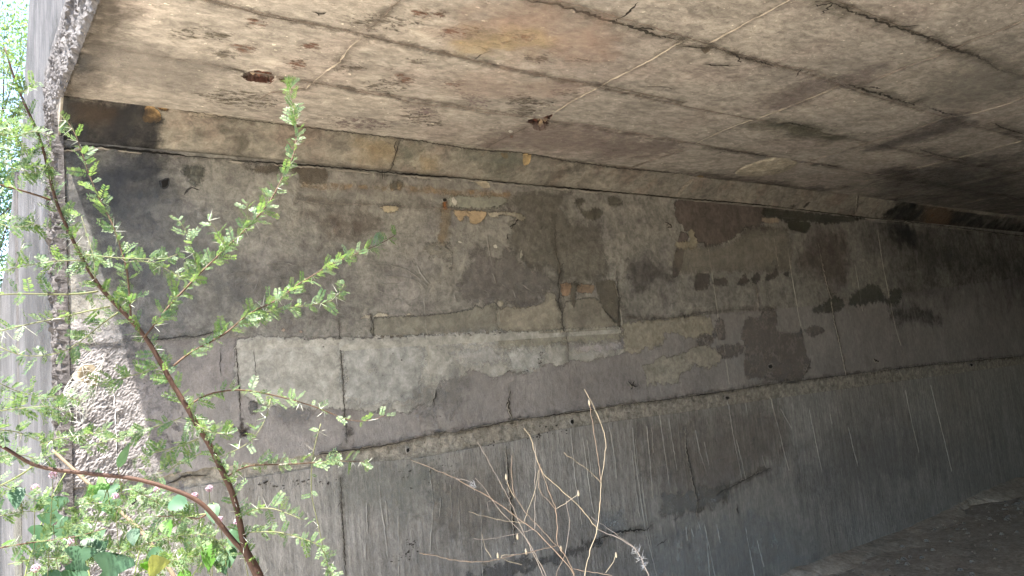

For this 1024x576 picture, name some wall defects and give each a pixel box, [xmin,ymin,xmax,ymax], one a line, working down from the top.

crack [815,1,1023,76]
crack [845,84,952,115]
spalling [42,0,184,576]
peeling [449,180,526,224]
water stain [627,173,862,292]
peeling [232,282,722,415]
crack [319,229,1021,542]